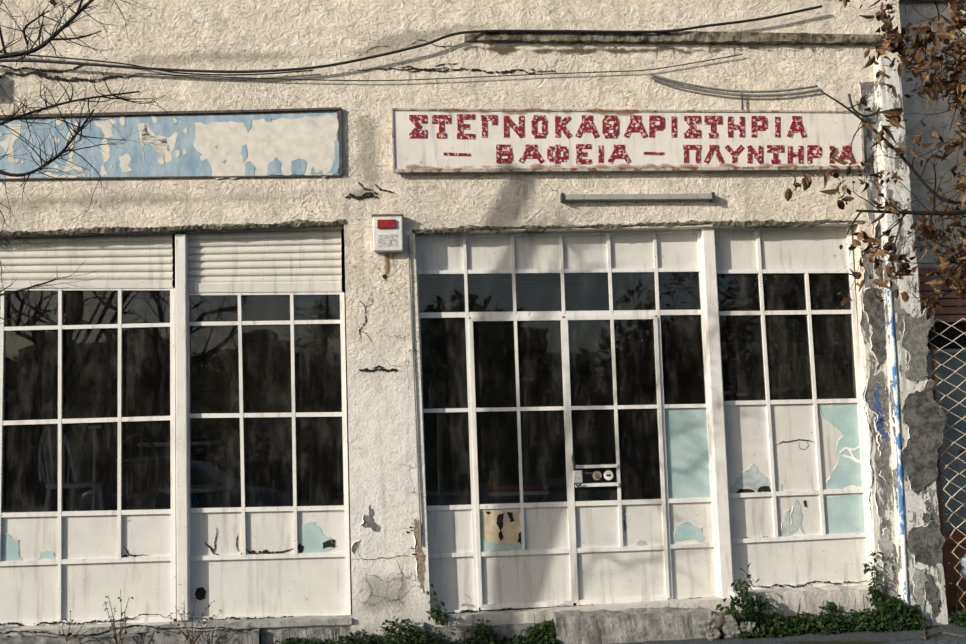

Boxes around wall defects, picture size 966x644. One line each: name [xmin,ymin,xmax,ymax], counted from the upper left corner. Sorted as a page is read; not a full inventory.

crack [352,39,556,74]
peeling [819,81,947,618]
peeling [298,521,336,553]
peeling [360,505,381,532]
crack [352,543,415,609]
peeling [406,518,425,593]